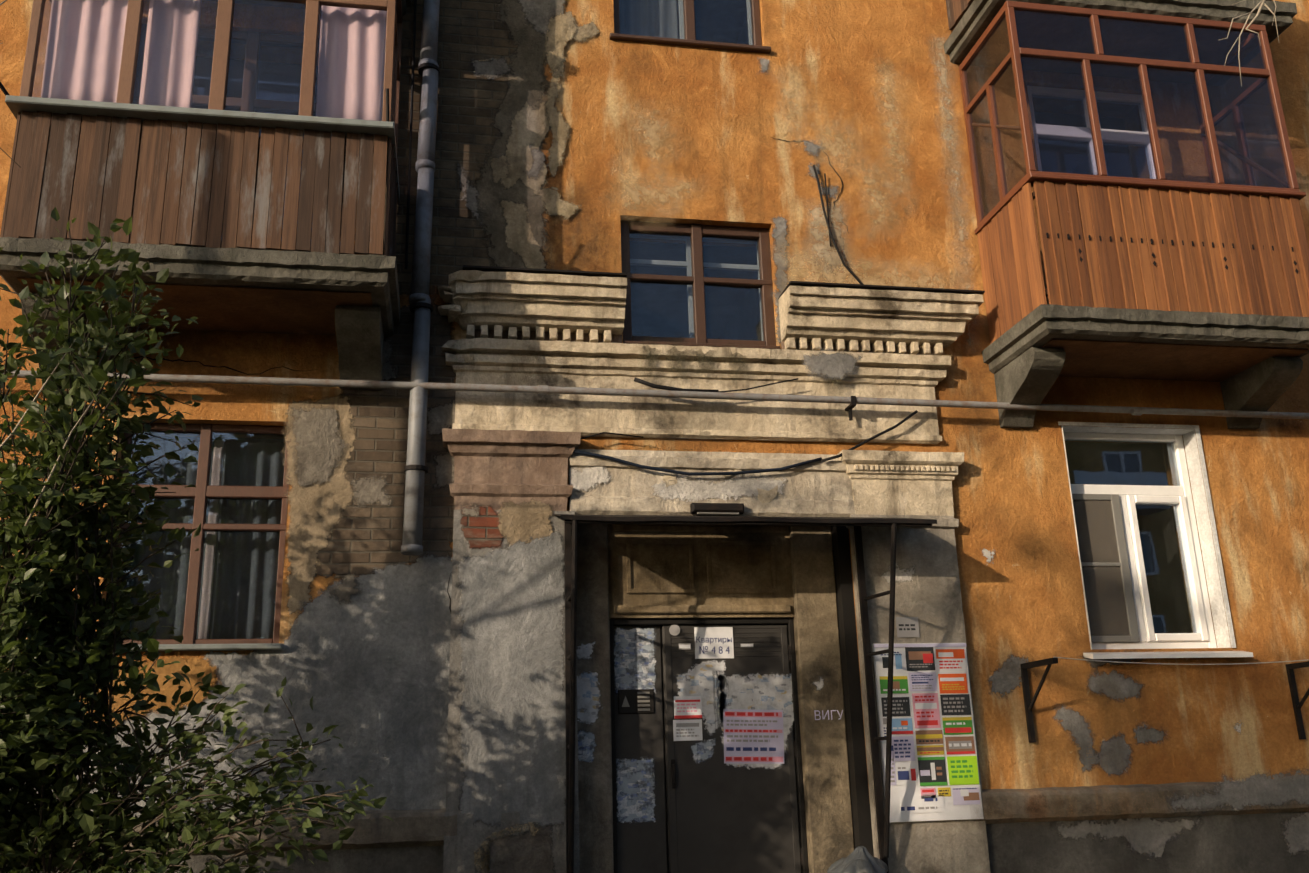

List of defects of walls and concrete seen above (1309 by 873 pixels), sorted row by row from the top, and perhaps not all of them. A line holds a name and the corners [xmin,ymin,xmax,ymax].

flaking render [292,0,599,579]
leakage [644,344,711,377]
peeling [569,466,611,493]
spalling [1082,651,1144,669]